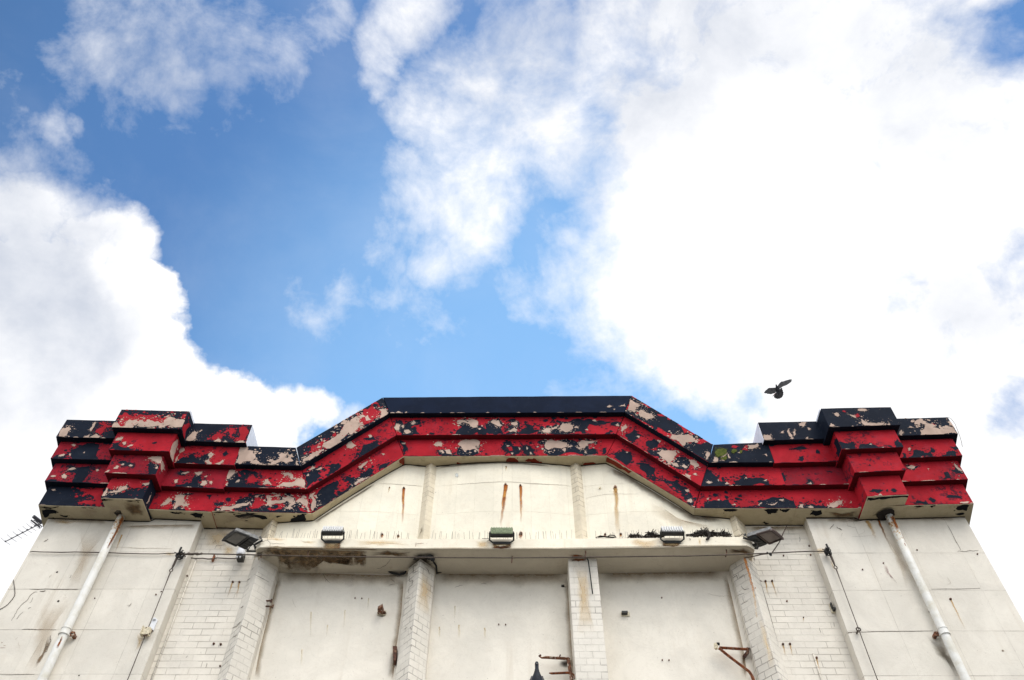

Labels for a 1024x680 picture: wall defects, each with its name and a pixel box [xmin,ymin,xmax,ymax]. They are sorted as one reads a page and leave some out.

peeling [830,408,964,480]
peeling [41,396,851,524]
corrosion [502,483,522,509]
peeling [868,488,969,515]
leakage [267,548,404,567]